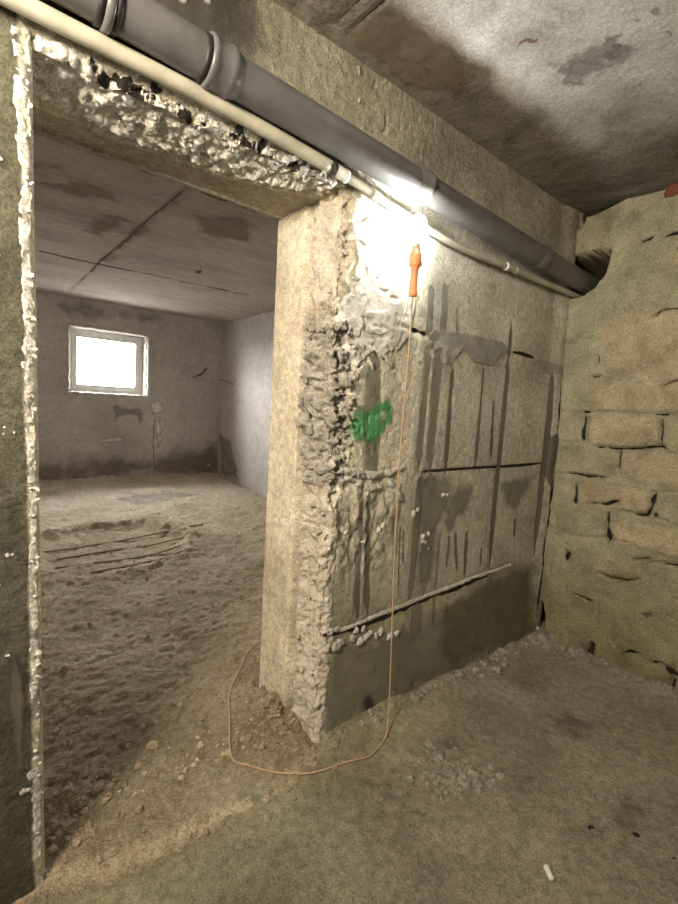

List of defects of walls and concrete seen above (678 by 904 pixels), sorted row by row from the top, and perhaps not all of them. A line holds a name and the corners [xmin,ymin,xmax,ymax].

crack [340,0,385,34]
leakage [558,38,631,85]
crack [37,191,262,295]
crack [643,231,678,242]
spalling [11,26,340,716]
spalling [292,200,416,743]
crack [320,567,508,637]
leakage [328,284,563,721]
crack [537,487,553,610]
crack [601,557,650,581]
flaking render [27,738,44,858]